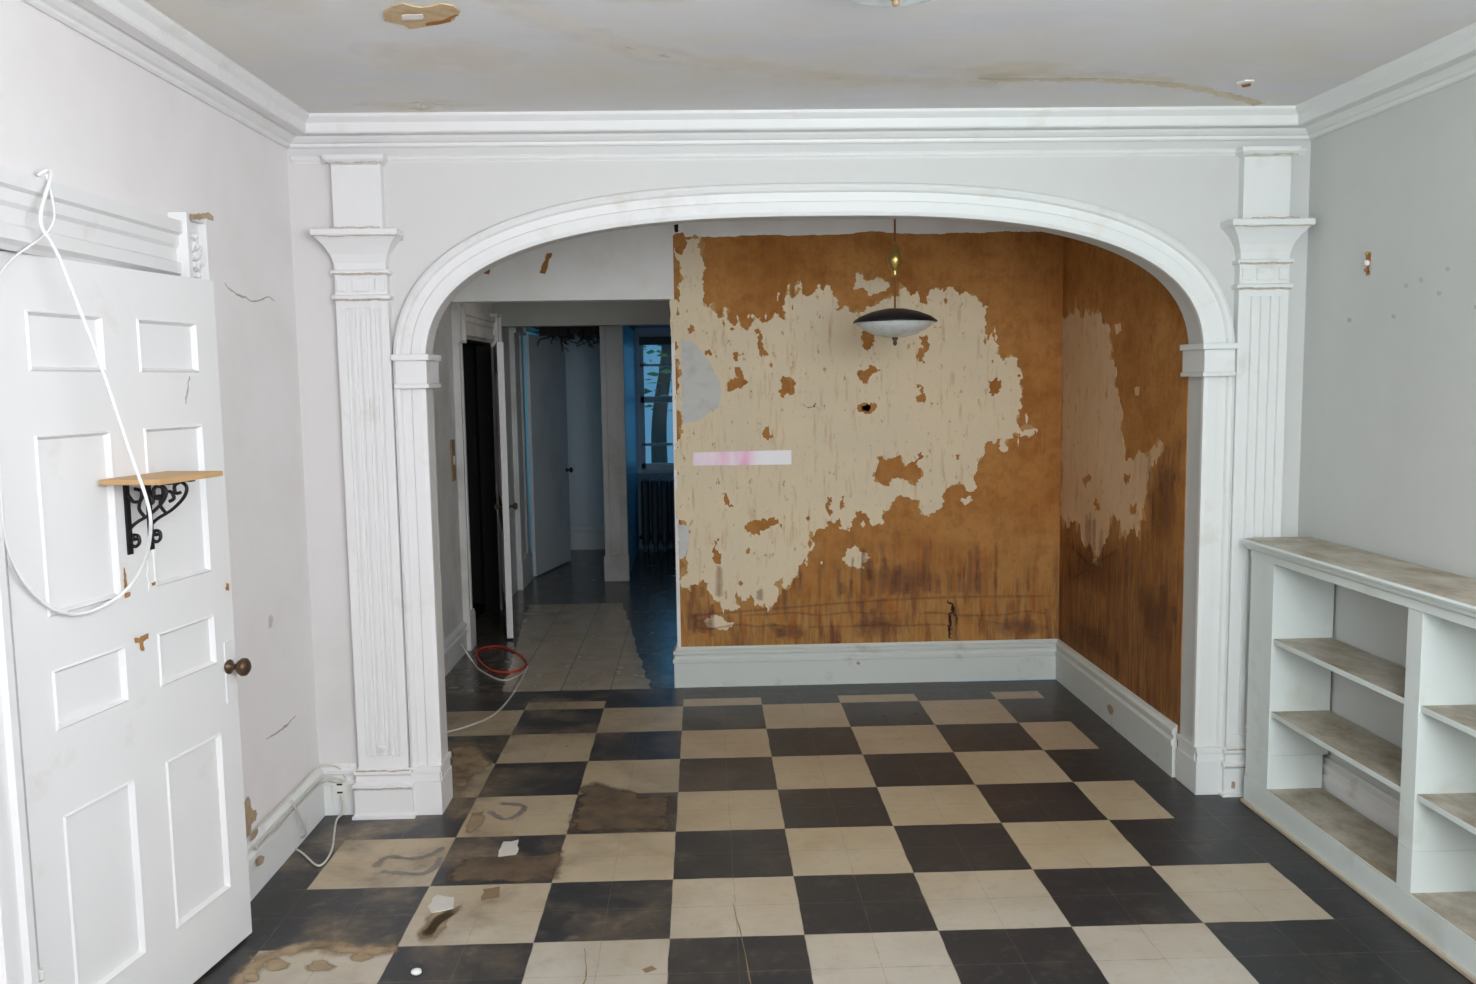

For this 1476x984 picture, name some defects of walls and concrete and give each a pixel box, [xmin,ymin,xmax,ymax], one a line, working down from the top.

spalling [383,2,460,29]
peeling [857,331,880,384]
peeling [916,335,930,364]
peeling [778,376,816,409]
peeling [857,402,877,414]
peeling [916,384,926,403]
peeling [988,378,1002,396]
peeling [825,496,845,531]
flaking render [677,524,690,559]
peeling [712,538,721,564]
peeling [744,517,782,554]
spalling [244,797,264,866]